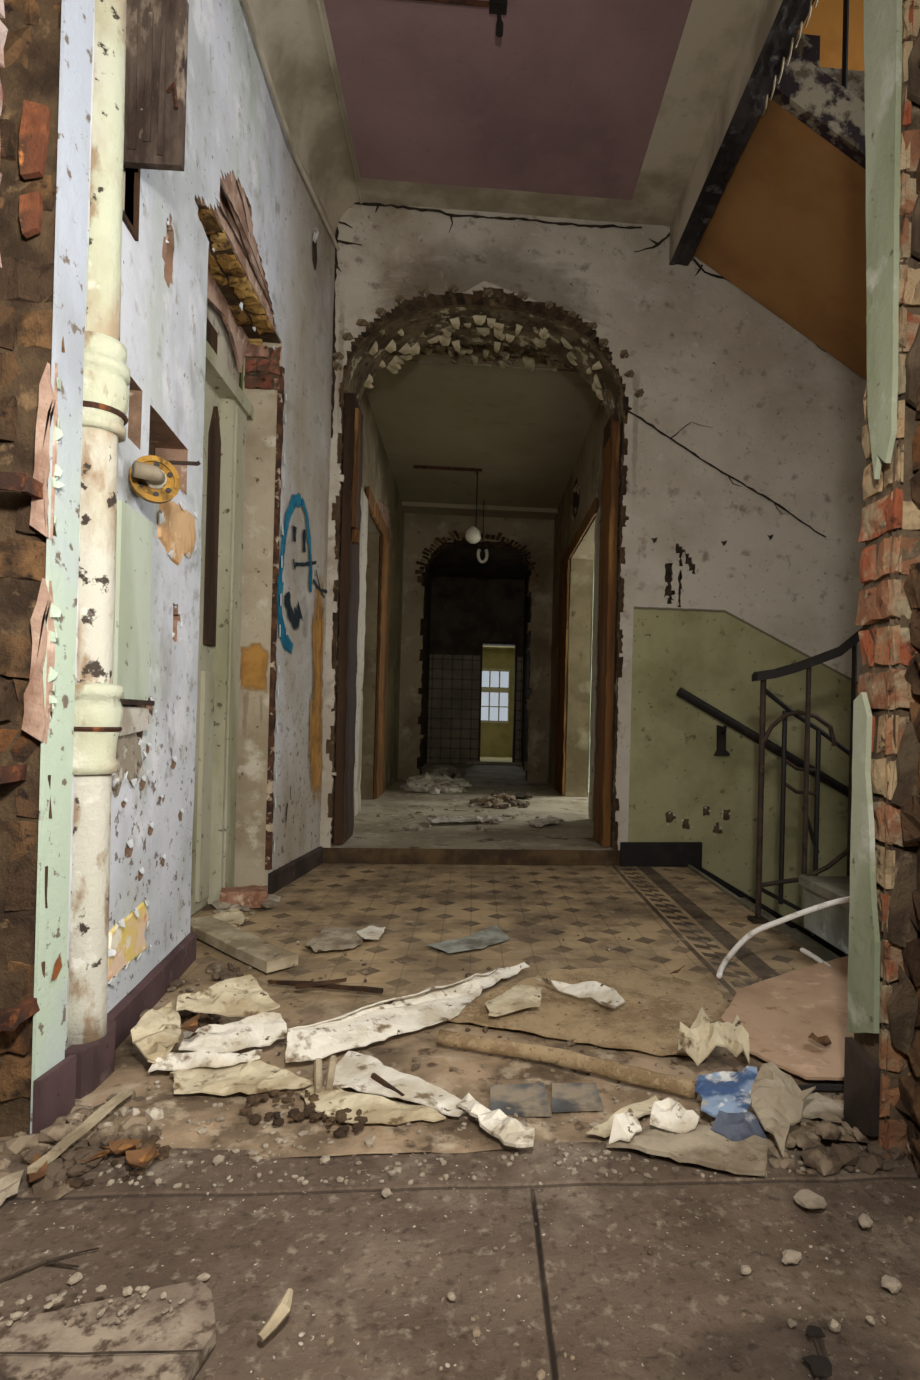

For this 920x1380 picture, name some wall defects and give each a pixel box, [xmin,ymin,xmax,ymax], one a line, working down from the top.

crack [693,258,731,283]
crack [331,202,670,438]
crack [623,407,826,538]
spalling [0,0,65,1137]
peeling [158,500,198,566]
spalling [326,284,644,850]
peeling [112,733,164,808]
peeling [125,822,154,881]
peeling [108,897,152,987]